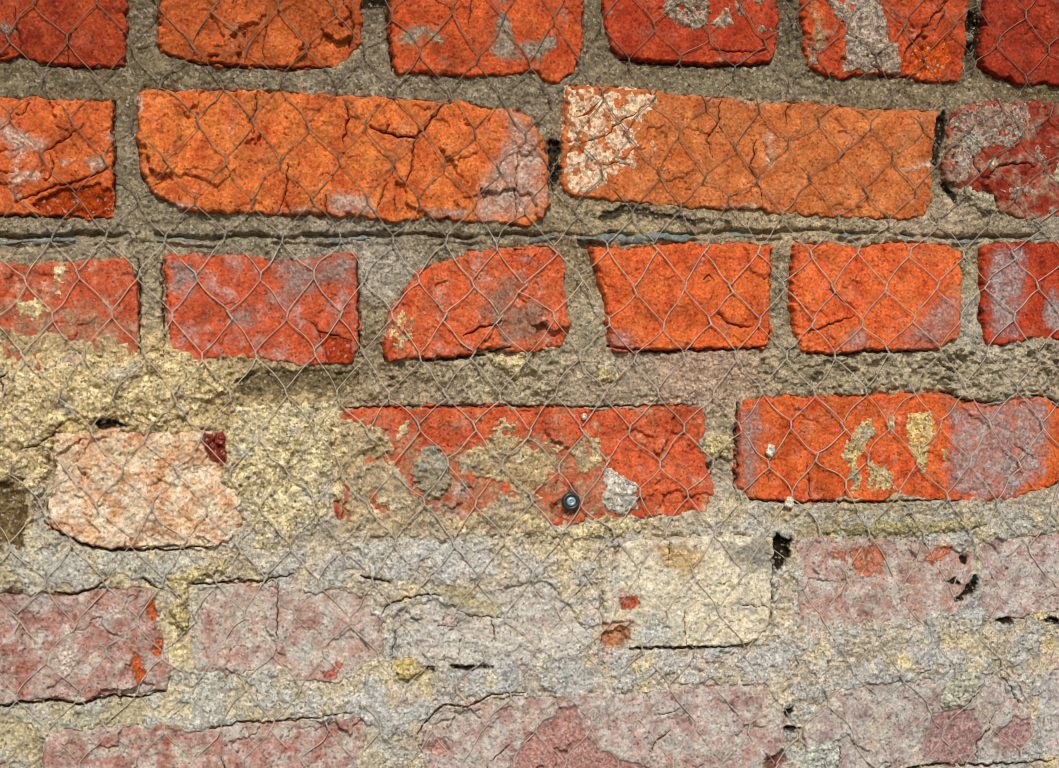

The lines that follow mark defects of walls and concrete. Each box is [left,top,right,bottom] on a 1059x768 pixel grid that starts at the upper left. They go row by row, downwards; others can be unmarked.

crack [343,0,355,49]
crack [189,27,331,120]
crack [342,102,441,211]
crack [564,101,645,144]
damp [558,85,658,198]
crack [705,102,722,158]
crack [748,140,763,205]
peeling [396,420,410,442]
peeling [458,454,476,477]
peeling [566,435,604,474]
peeling [841,411,948,494]